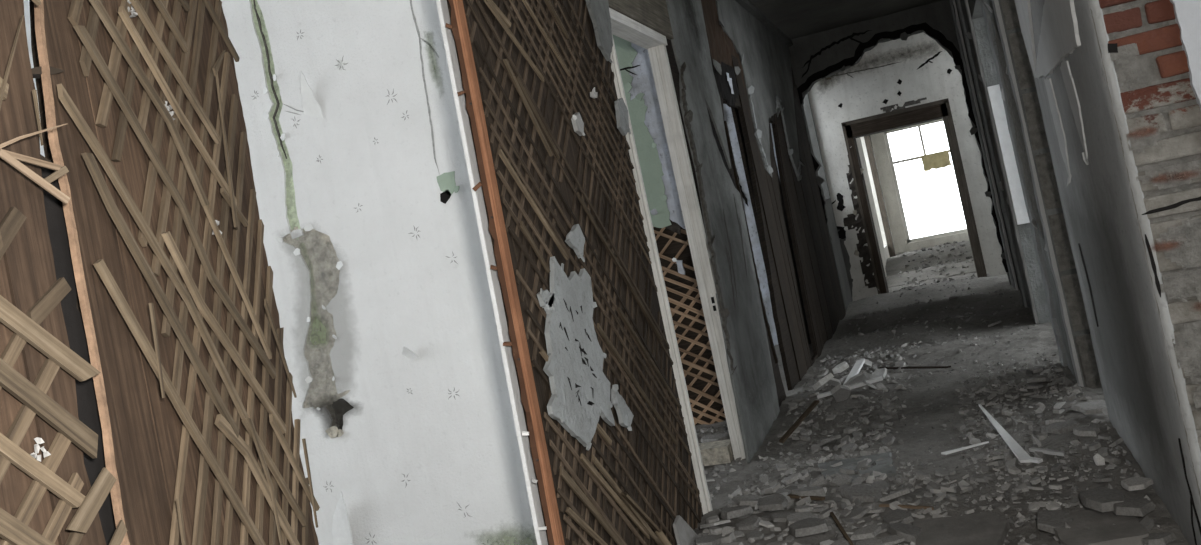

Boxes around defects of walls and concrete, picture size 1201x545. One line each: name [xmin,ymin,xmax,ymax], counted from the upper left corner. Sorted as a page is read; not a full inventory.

crack [251,0,323,240]
spalling [276,223,344,410]
peeling [437,171,459,195]
spalling [448,0,554,545]
flaking render [571,112,585,136]
flaking render [537,224,634,451]
peeling [586,0,681,234]
spalling [797,22,1009,272]
spalling [984,0,1102,388]
spalling [1089,0,1201,501]
flaking render [332,491,353,545]